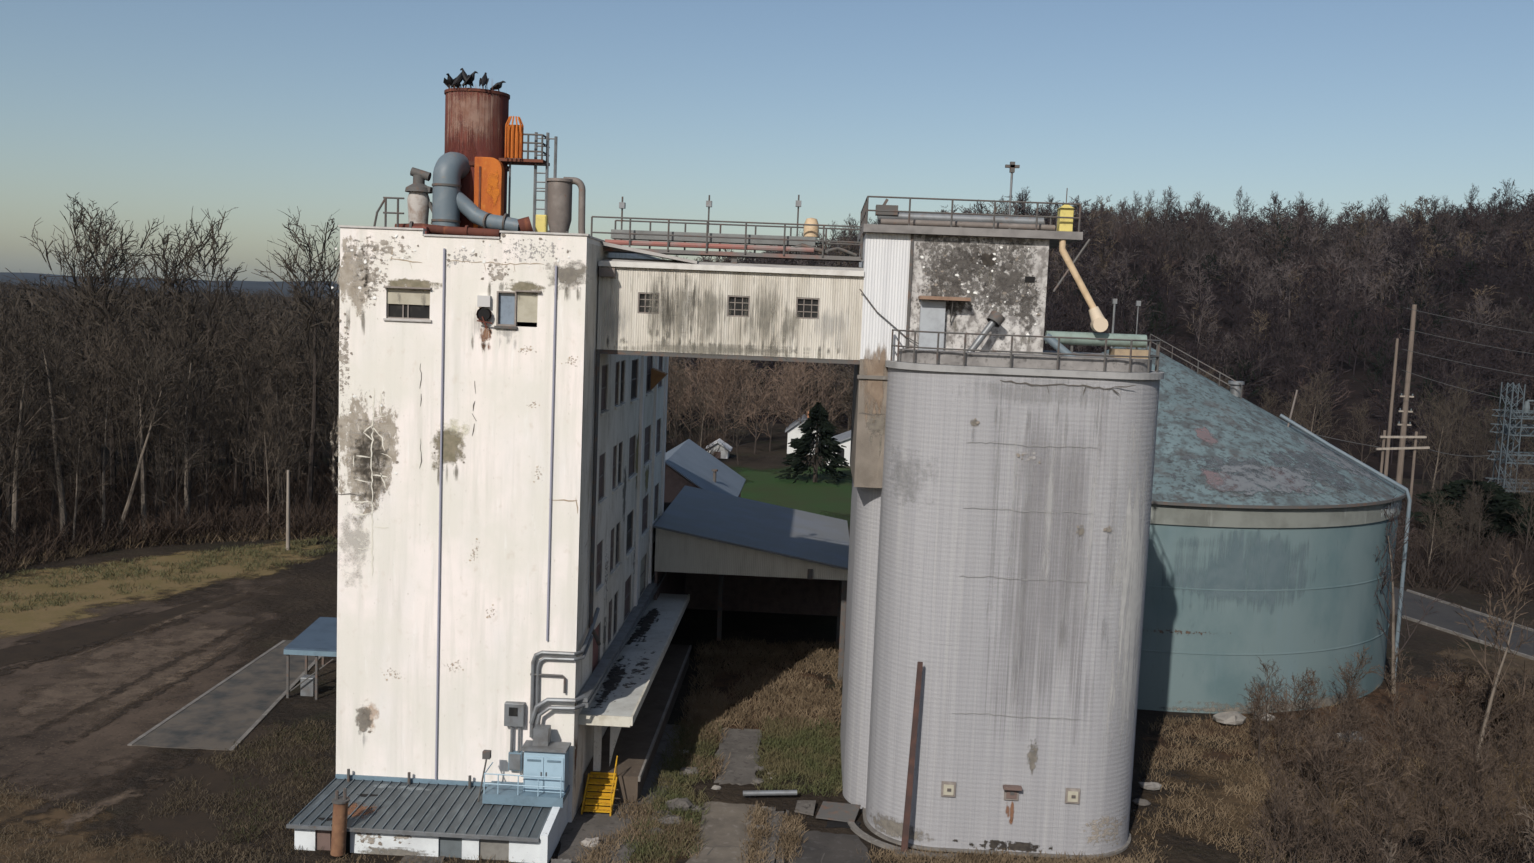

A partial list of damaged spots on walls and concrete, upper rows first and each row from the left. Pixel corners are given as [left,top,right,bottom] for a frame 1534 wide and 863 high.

rust [445,89,505,161]
damp [648,277,726,348]
damp [744,294,796,360]
peeling [916,234,1043,341]
peeling [330,234,419,523]
peeling [1169,427,1356,497]